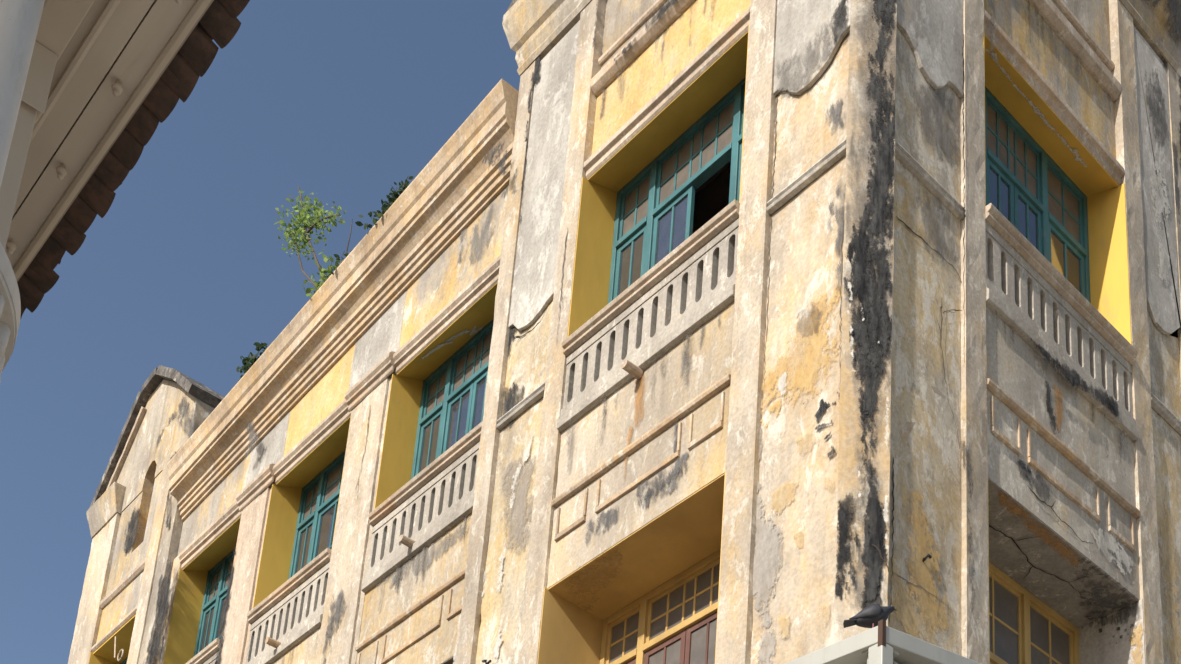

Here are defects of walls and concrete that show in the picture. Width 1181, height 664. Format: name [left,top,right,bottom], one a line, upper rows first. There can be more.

water stain [1145,55,1181,210]
water stain [777,0,897,608]
water stain [636,423,689,509]
peeling [758,282,864,460]
water stain [1045,381,1056,432]
water stain [1030,339,1119,417]
water stain [124,508,142,556]
water stain [143,560,173,664]
flaking render [750,482,803,664]
crack [989,485,1093,606]
flaking render [999,494,1143,664]